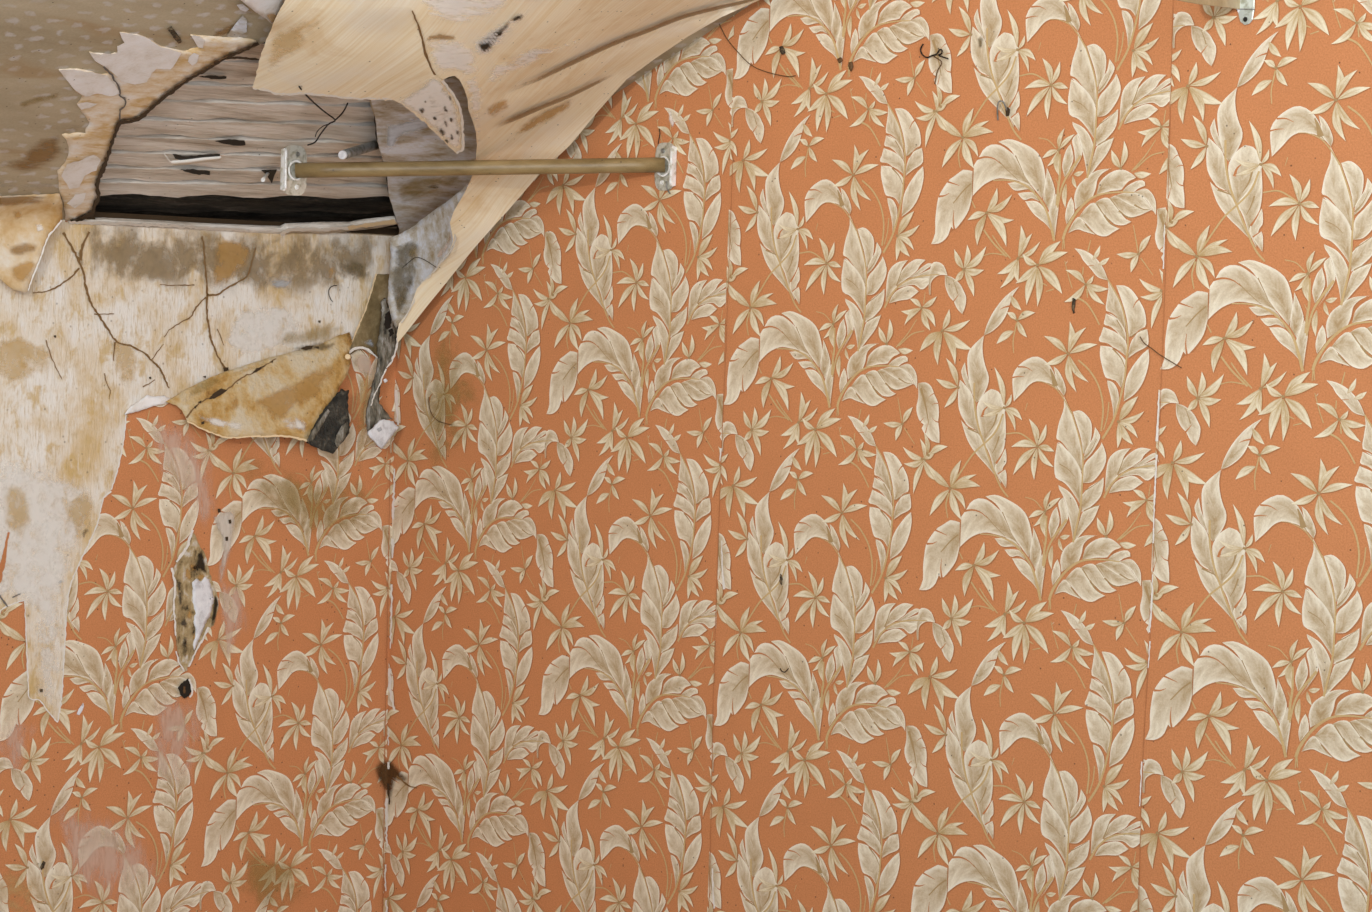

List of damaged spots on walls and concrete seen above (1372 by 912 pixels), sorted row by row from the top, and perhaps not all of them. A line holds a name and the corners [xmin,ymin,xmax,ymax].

crack [33,42,260,397]
flaking render [173,139,245,175]
water stain [215,243,248,281]
water stain [330,263,364,276]
water stain [365,298,399,449]
peeling [0,193,393,722]